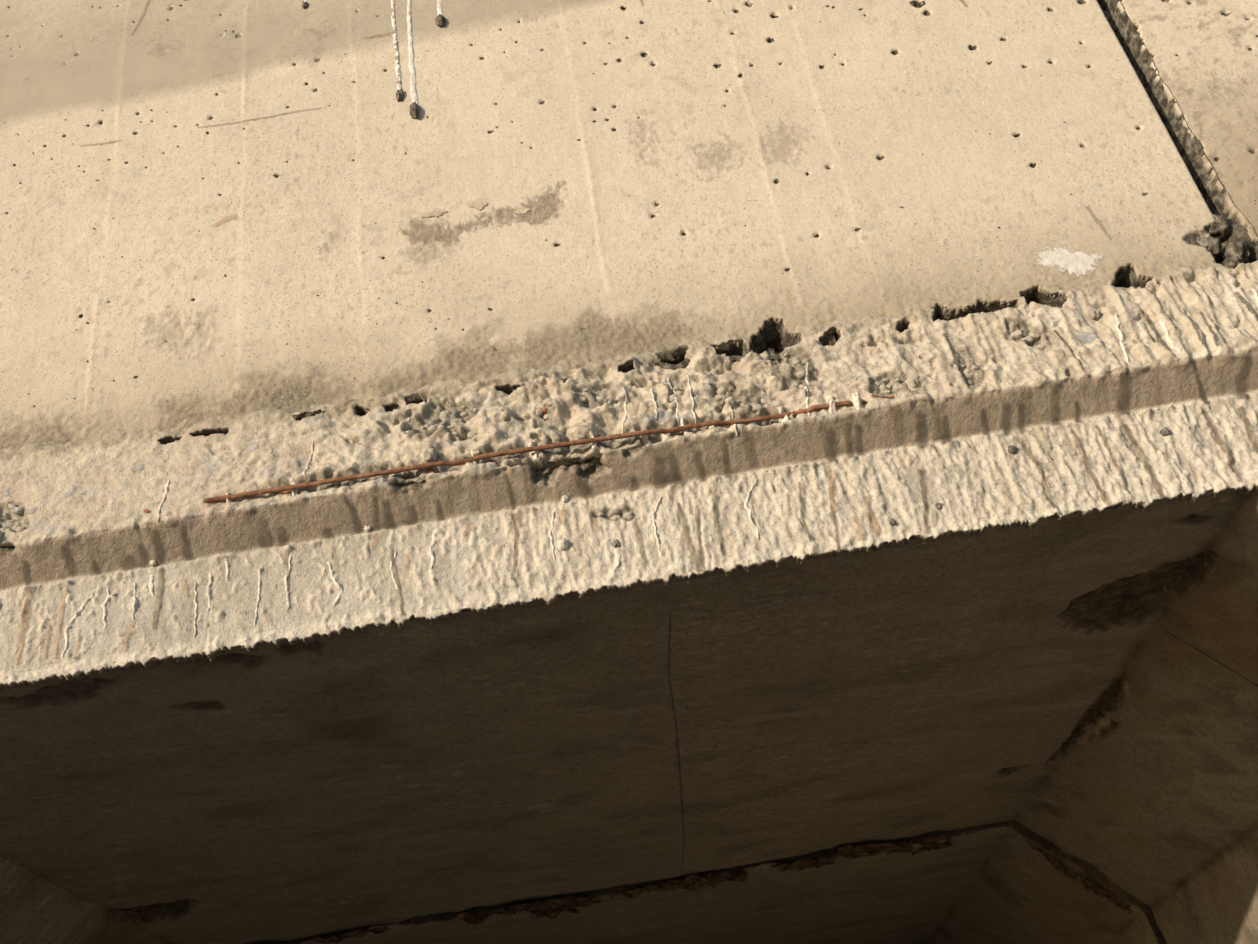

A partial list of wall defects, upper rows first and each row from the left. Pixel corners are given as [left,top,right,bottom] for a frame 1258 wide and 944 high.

damp [391,0,419,119]
crack [1097,0,1258,269]
spalling [204,349,927,504]
spalling [715,319,819,390]
spalling [820,333,840,346]
spalling [933,288,1064,350]
damp [980,403,1055,508]
damp [1051,383,1110,505]
spalling [1113,266,1151,288]
damp [1115,314,1163,498]
damp [1140,308,1242,481]
spalling [1184,217,1256,264]